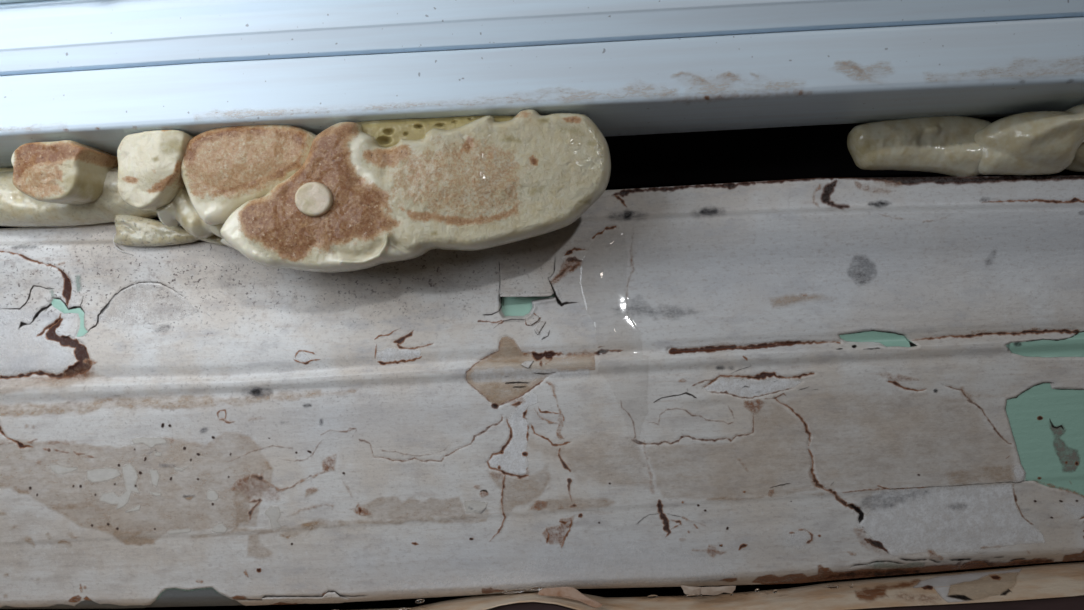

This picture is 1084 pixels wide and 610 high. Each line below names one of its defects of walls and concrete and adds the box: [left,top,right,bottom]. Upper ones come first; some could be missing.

peeling [51,291,88,337]
crack [0,251,181,379]
peeling [483,261,577,339]
crack [669,341,840,371]
peeling [838,330,917,349]
crack [923,328,1080,340]
peeling [1006,331,1084,357]
crack [531,382,572,497]
peeling [1006,382,1084,497]
leakage [50,463,161,512]
crack [775,398,970,568]
crack [638,500,681,536]